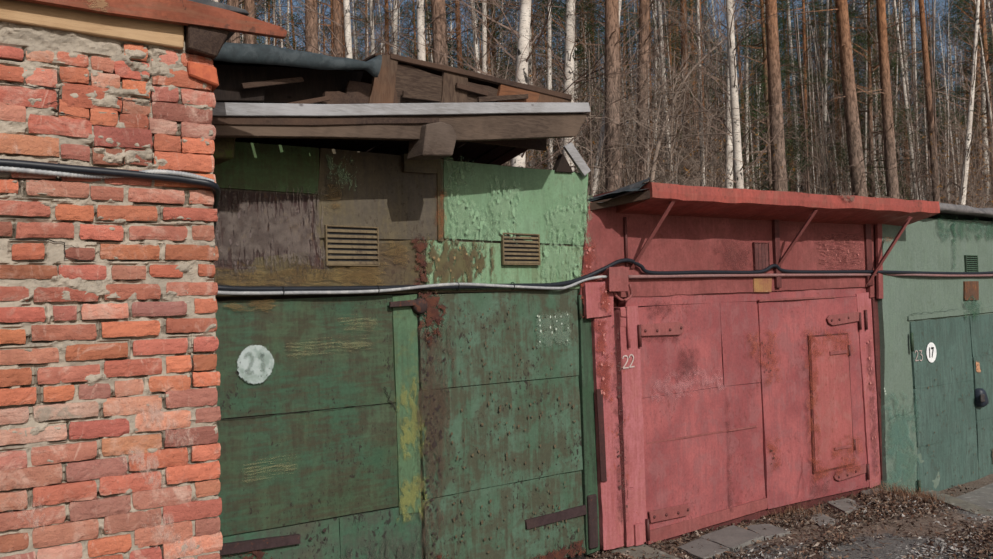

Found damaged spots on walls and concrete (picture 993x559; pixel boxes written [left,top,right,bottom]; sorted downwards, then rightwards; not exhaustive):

corrosion [534,540,586,559]